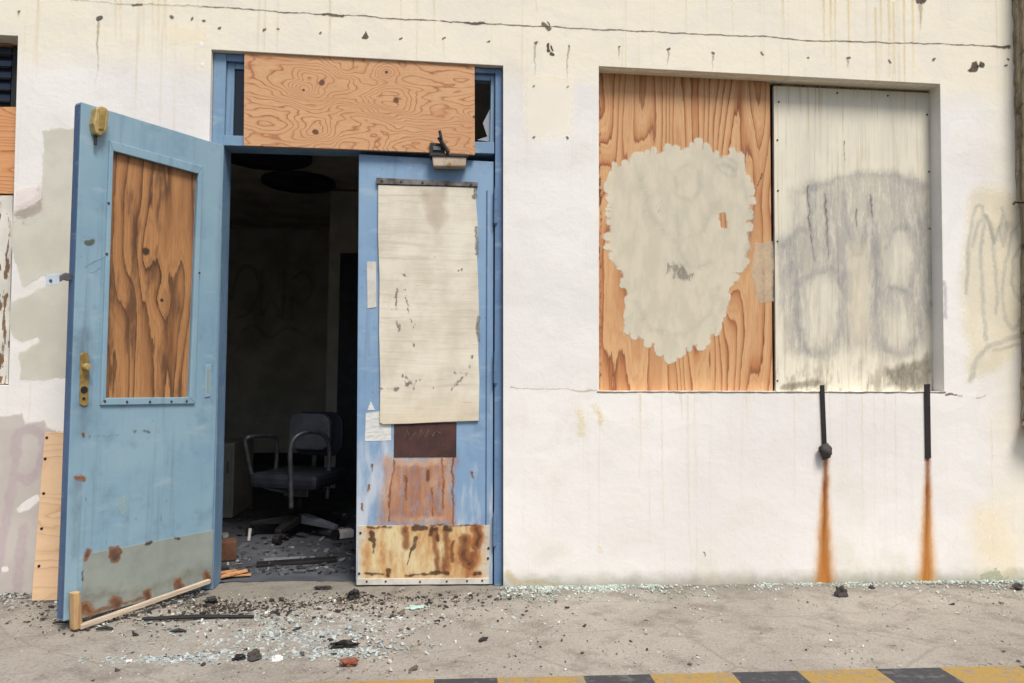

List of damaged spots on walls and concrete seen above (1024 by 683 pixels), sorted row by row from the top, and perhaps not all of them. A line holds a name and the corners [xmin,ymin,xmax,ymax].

crack [202,6,1011,49]
corrosion [109,546,122,562]
corrosion [81,589,151,616]
corrosion [367,458,483,577]
corrosion [819,459,831,583]
corrosion [921,467,932,581]